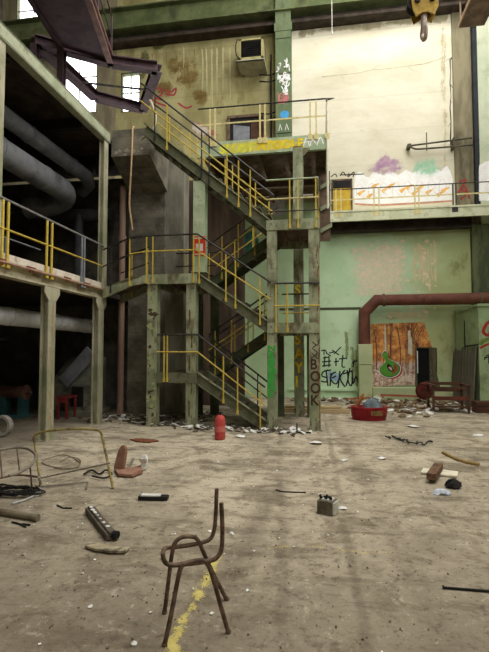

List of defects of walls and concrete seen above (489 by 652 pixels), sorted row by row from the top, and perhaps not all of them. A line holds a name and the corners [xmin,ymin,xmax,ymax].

leakage [155,46,231,110]
peeling [349,239,437,299]